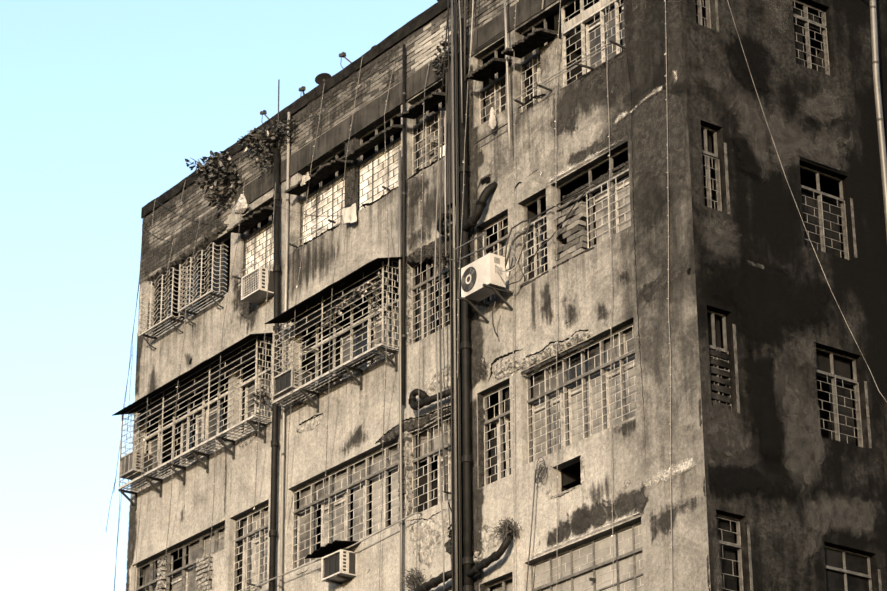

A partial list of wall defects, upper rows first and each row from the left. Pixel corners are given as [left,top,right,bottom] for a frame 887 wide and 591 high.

damp [550,0,688,193]
damp [531,281,578,329]
spalling [493,329,593,380]
damp [539,479,702,550]